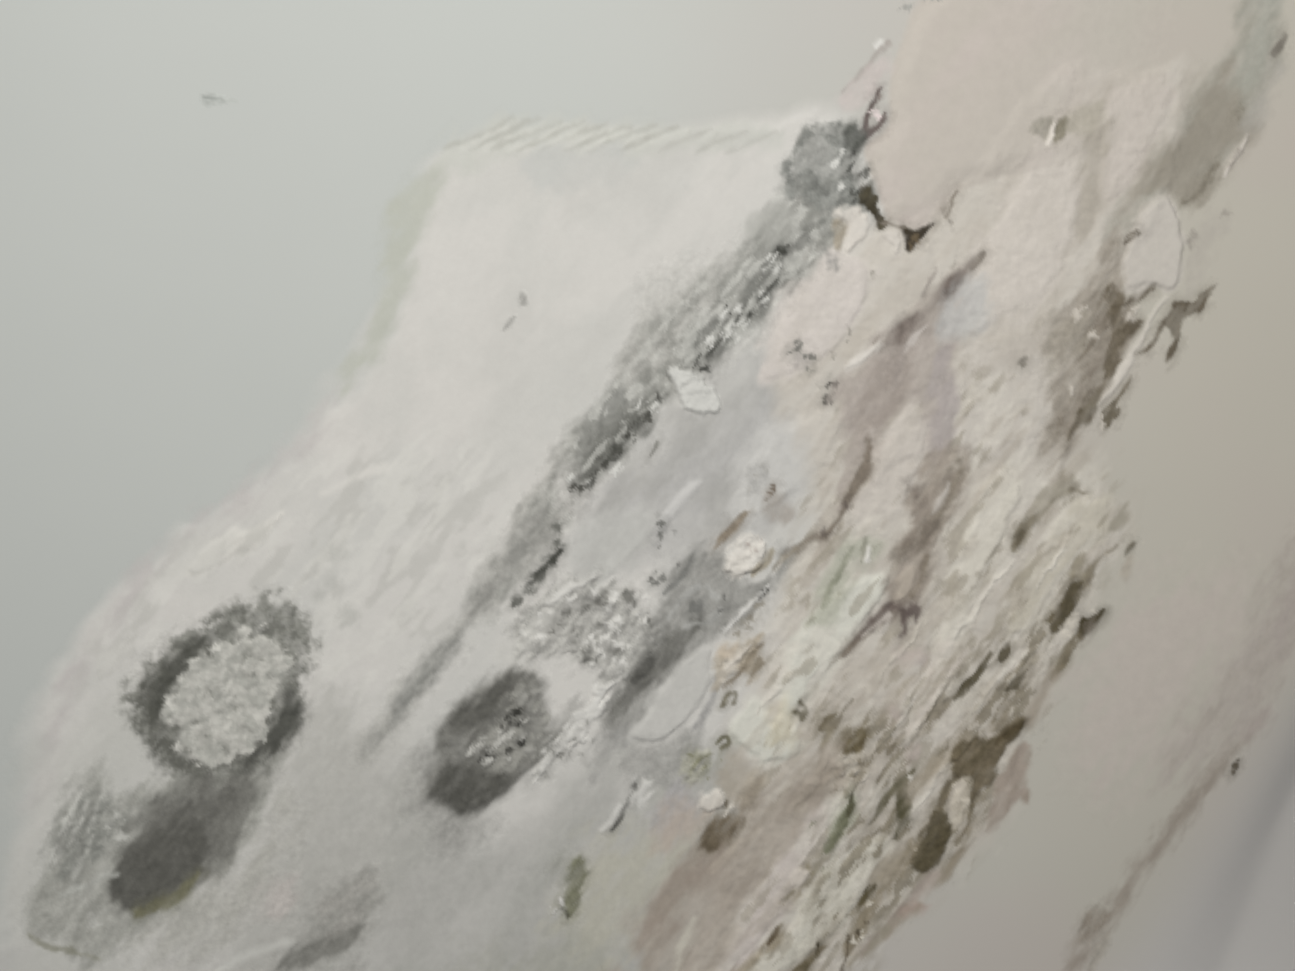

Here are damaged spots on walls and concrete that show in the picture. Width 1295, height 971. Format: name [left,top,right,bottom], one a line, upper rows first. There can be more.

spalling [486,509,686,789]
leakage [349,113,884,769]
leakage [0,504,1295,971]
spalling [639,428,672,467]
peeling [704,44,1198,971]
leakage [778,0,1295,680]